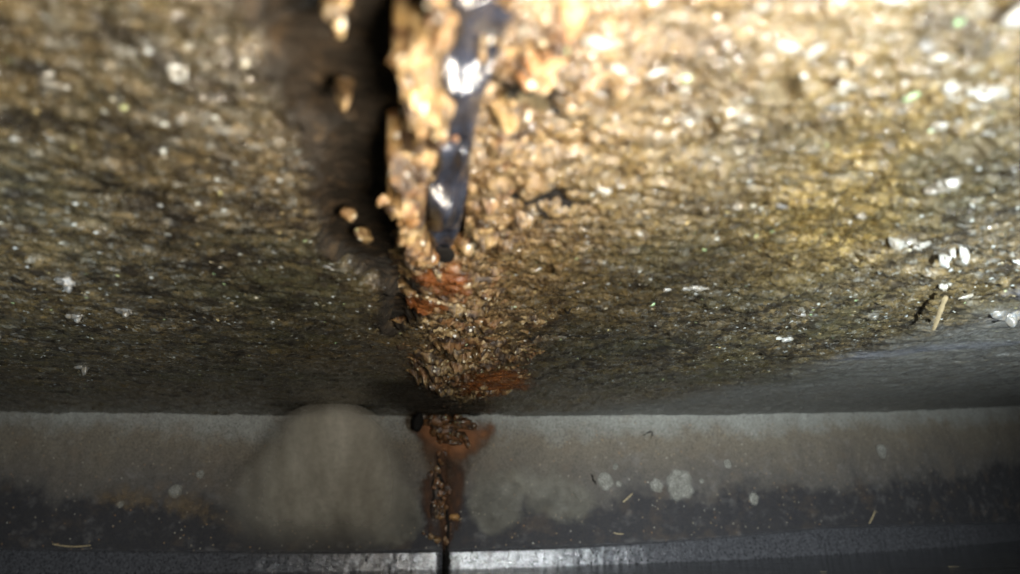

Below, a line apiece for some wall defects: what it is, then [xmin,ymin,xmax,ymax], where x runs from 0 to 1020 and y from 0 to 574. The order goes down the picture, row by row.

rust [321,0,352,38]
rust [334,75,354,111]
spalling [506,83,551,111]
rust [487,0,588,172]
spalling [234,0,421,337]
rust [340,206,374,244]
rust [377,0,557,546]